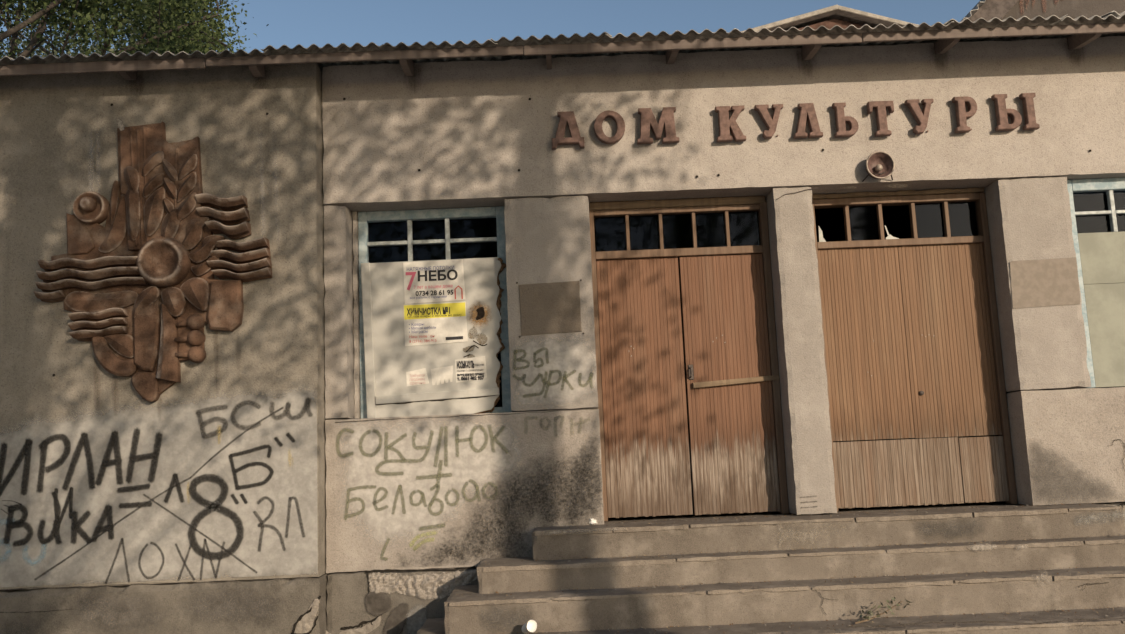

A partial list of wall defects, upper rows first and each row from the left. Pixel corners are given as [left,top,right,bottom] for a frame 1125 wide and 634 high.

spalling [291,596,382,634]